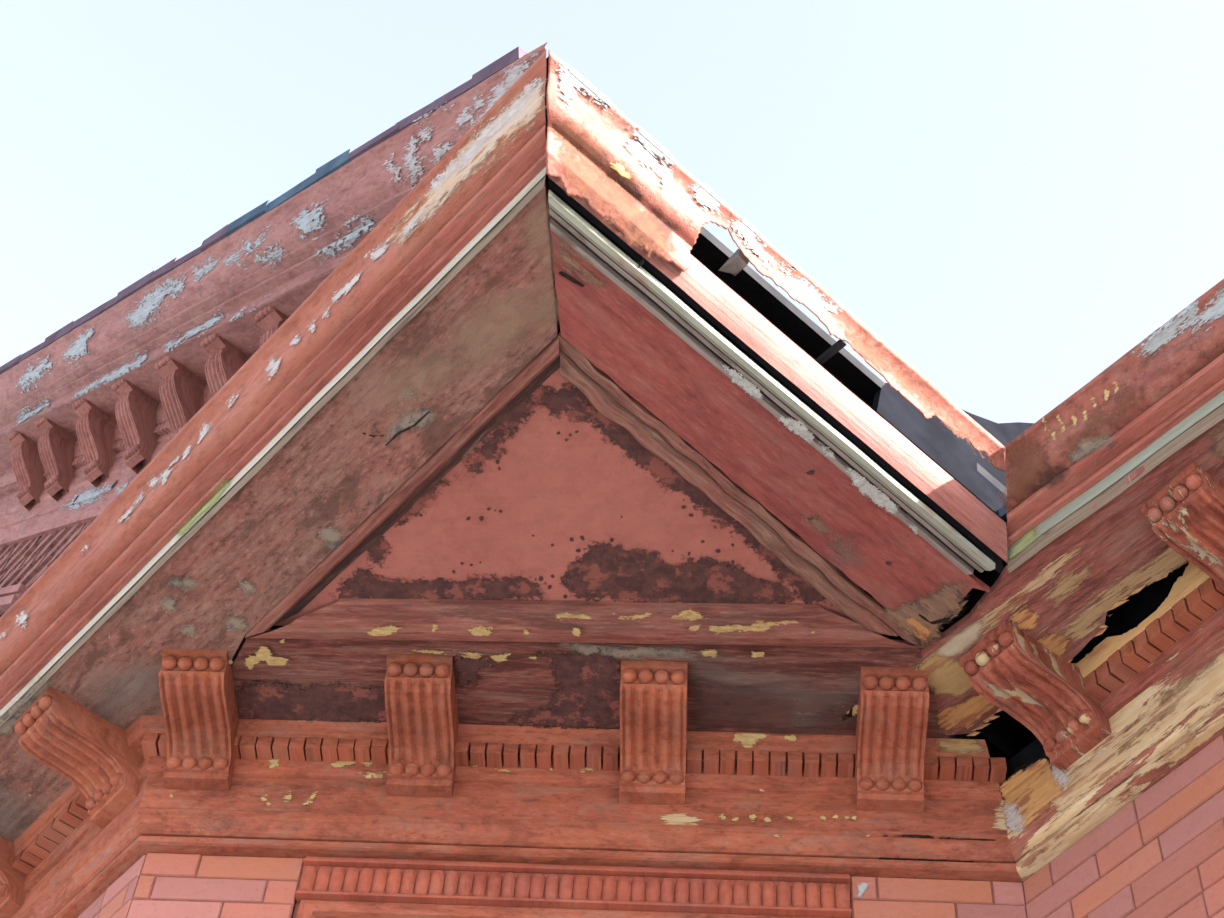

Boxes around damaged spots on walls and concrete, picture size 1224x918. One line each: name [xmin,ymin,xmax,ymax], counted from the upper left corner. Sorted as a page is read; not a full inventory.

peeling [121,53,842,381]
peeling [1132,285,1224,358]
peeling [14,323,95,425]
peeling [72,350,148,399]
peeling [59,422,214,526]
peeling [410,649,511,663]
damp [453,654,495,688]
damp [508,647,621,730]
peeling [556,608,798,659]
damp [691,672,858,734]
peeling [936,541,1187,658]
peeling [1017,652,1224,868]